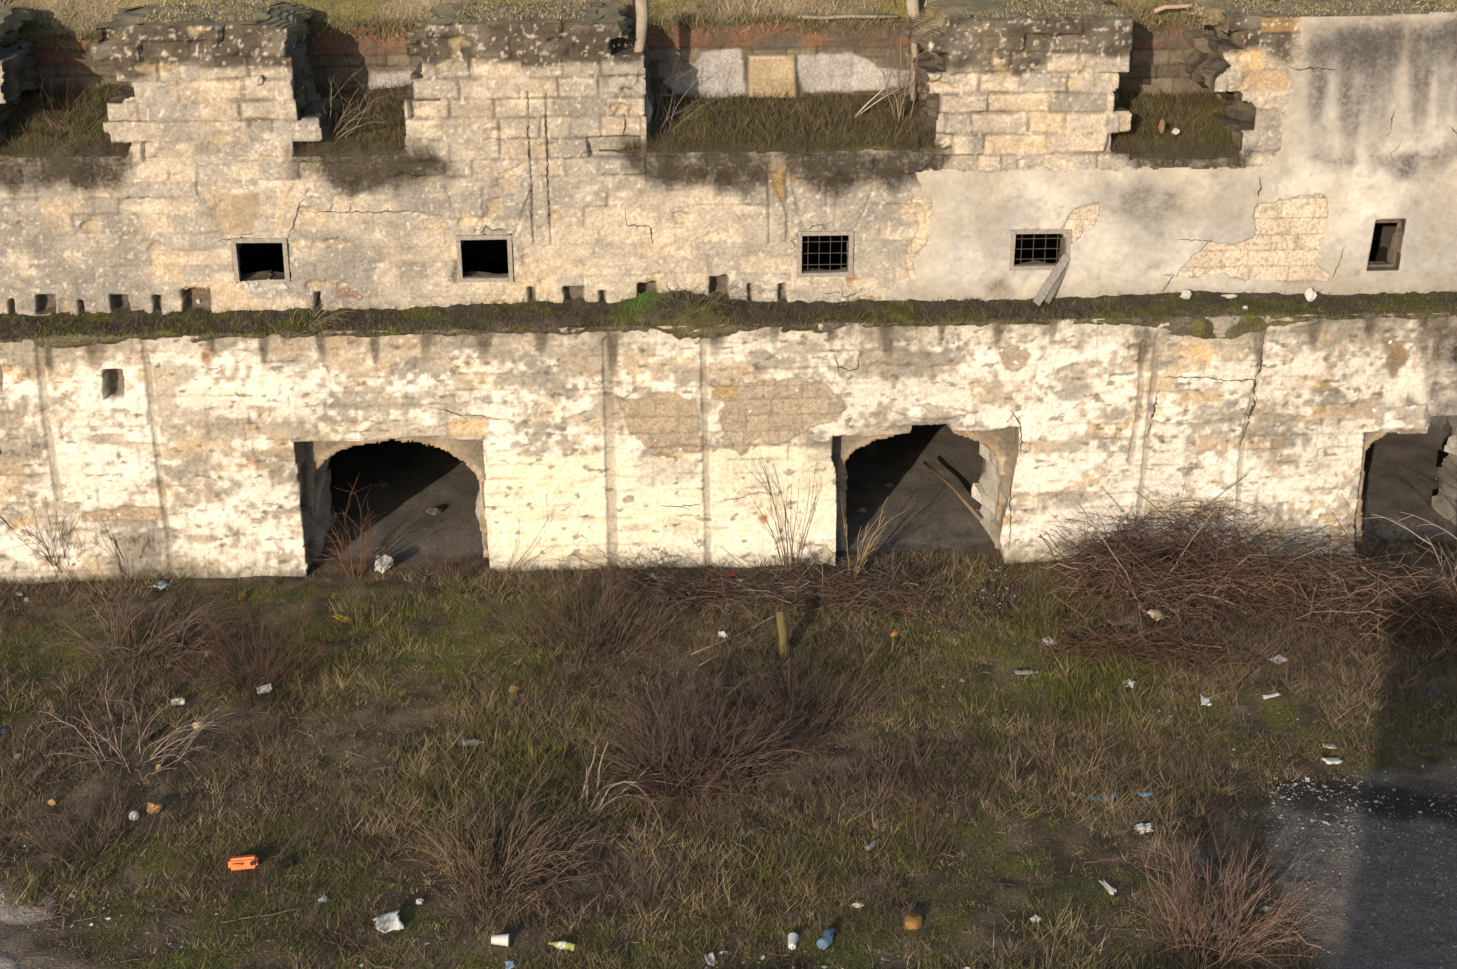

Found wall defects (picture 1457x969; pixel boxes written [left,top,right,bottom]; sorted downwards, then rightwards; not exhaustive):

leakage [1314,26,1455,117]
leakage [1399,154,1445,177]
flaking render [1177,193,1330,281]
crack [1146,331,1265,446]